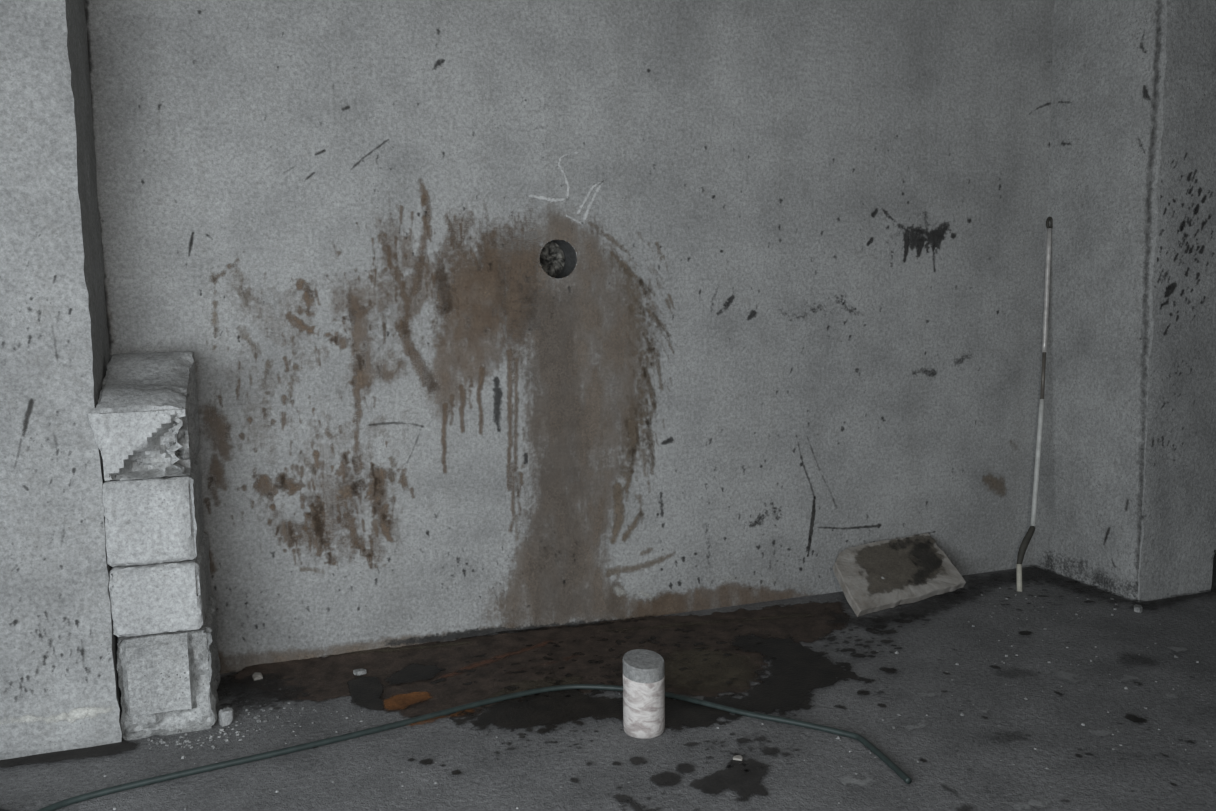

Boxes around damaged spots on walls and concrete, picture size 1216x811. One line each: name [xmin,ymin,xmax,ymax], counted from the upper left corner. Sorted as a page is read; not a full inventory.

corrosion [205,396,252,513]
corrosion [242,279,412,568]
water stain [217,185,793,710]
water stain [407,758,461,775]
water stain [450,656,623,760]
water stain [612,565,1216,811]